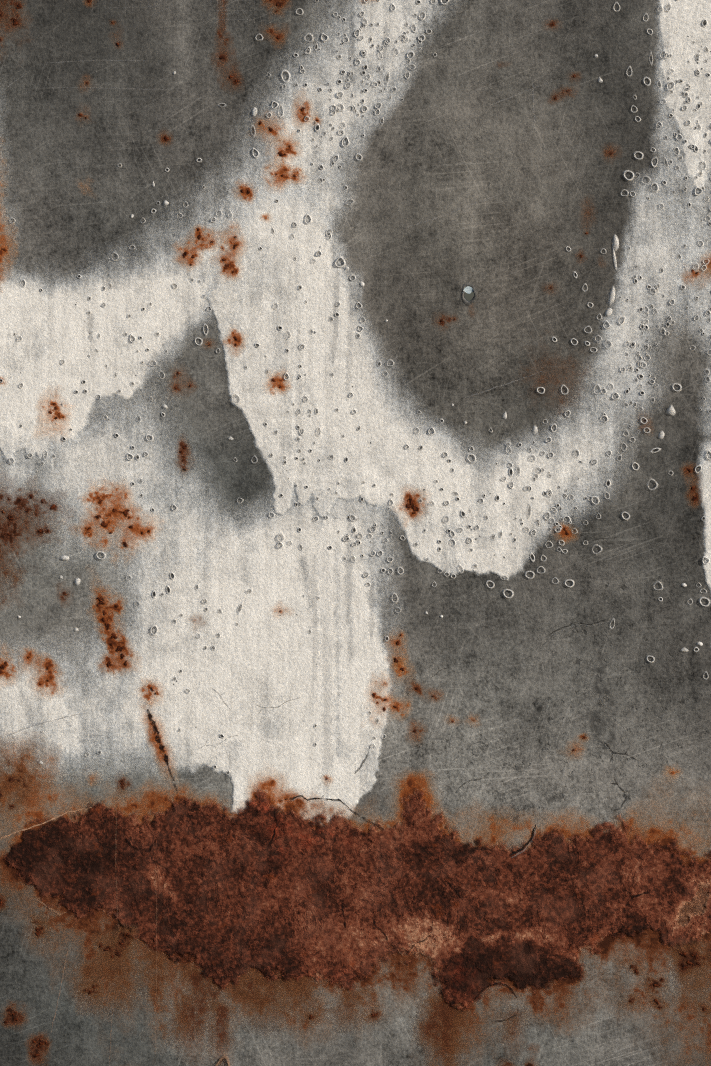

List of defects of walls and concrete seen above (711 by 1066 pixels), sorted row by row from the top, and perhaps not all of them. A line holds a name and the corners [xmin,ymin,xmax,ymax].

corrosion [178,226,243,277]
corrosion [81,486,154,549]
corrosion [93,589,133,673]
corrosion [0,682,711,1066]